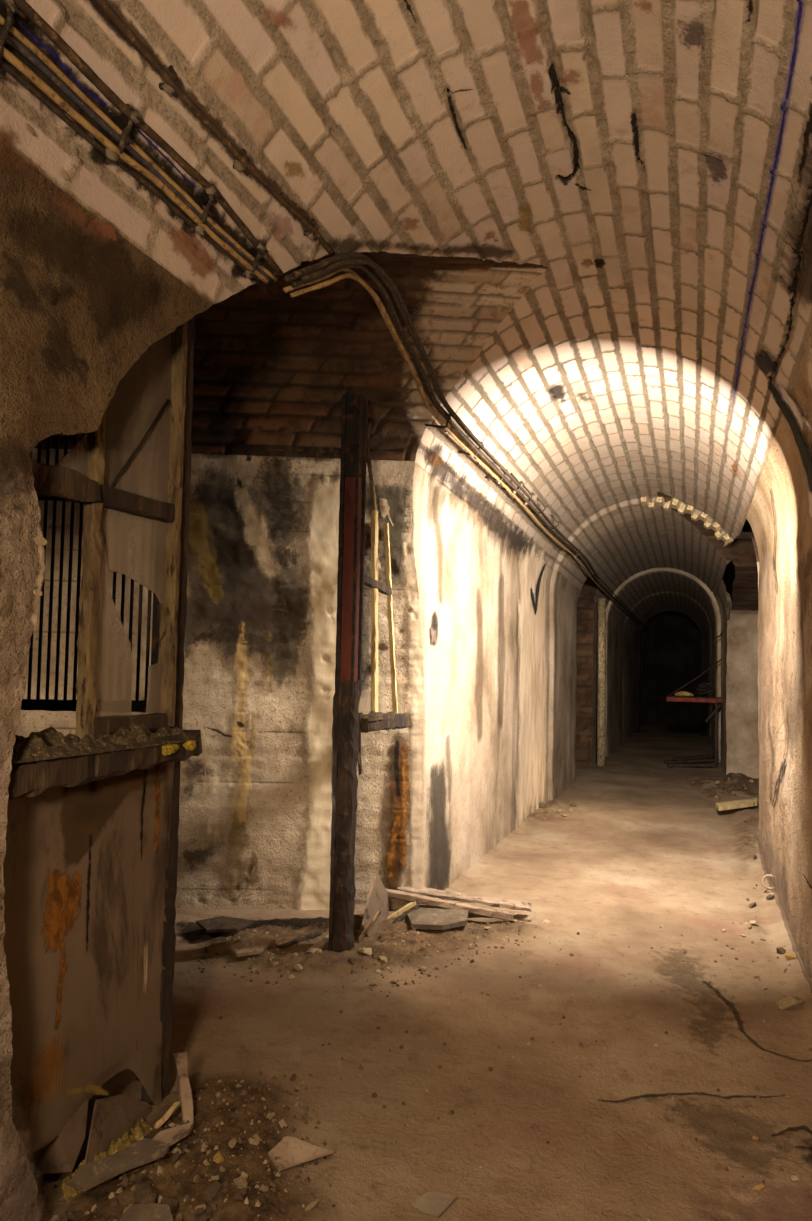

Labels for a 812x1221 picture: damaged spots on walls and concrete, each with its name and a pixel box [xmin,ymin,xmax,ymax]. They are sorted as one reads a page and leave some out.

crack [404,0,416,22]
crack [447,88,473,149]
crack [548,63,591,191]
crack [630,113,645,172]
crack [774,77,812,363]
leakage [779,148,812,302]
leakage [183,444,341,910]
rust [380,732,410,890]
rust [26,801,109,1108]
crack [702,981,812,1062]
crack [598,1092,785,1103]
crack [772,1125,812,1164]